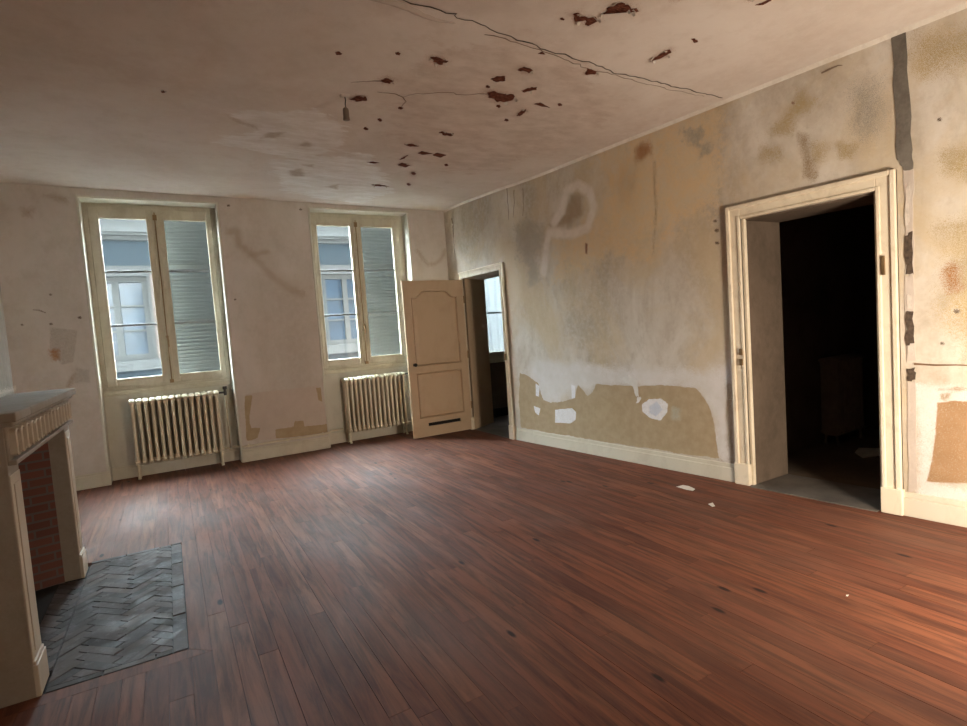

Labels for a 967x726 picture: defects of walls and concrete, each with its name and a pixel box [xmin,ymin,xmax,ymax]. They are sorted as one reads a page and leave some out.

spalling [560,1,643,27]
spalling [425,54,453,68]
crack [403,0,722,98]
spalling [647,45,675,64]
crack [351,81,485,106]
spalling [479,76,562,122]
spalling [891,32,967,492]
peeling [519,373,719,459]